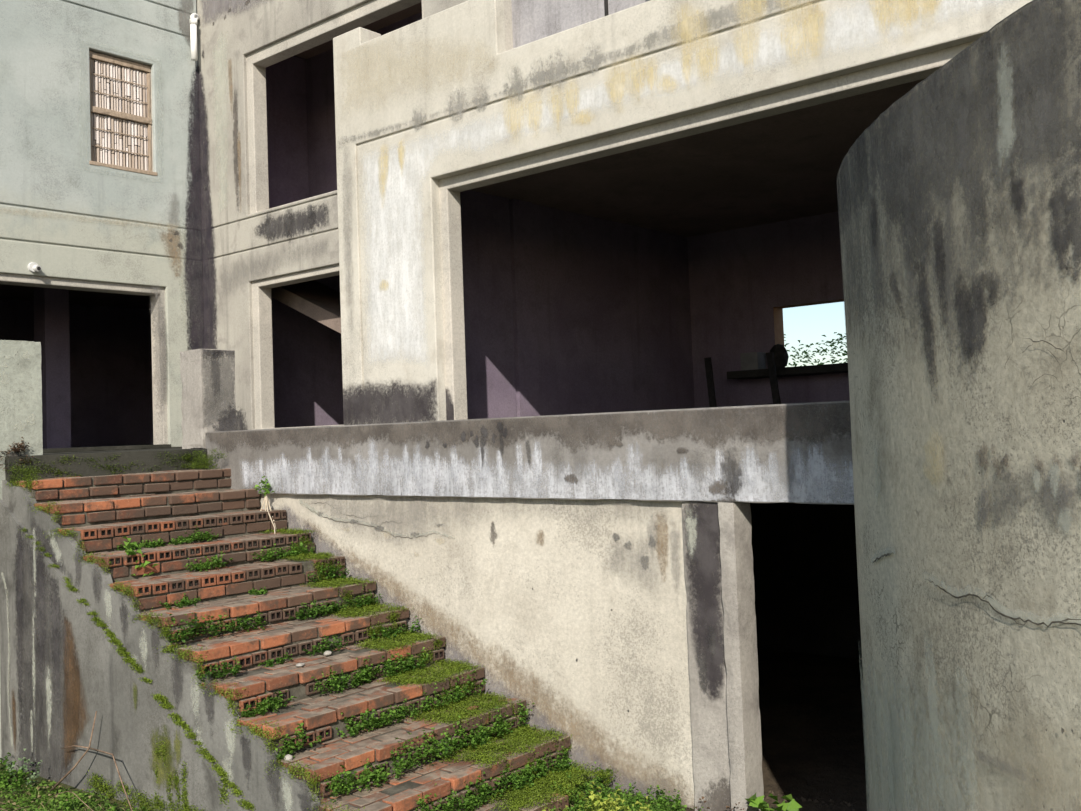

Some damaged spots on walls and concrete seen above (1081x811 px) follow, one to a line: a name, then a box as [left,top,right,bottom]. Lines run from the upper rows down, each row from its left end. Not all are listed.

damp [837,0,1081,395]
damp [163,0,854,704]
crack [1000,205,1067,388]
damp [964,444,1081,529]
damp [283,509,685,805]
crack [928,579,1081,627]
damp [698,778,731,811]